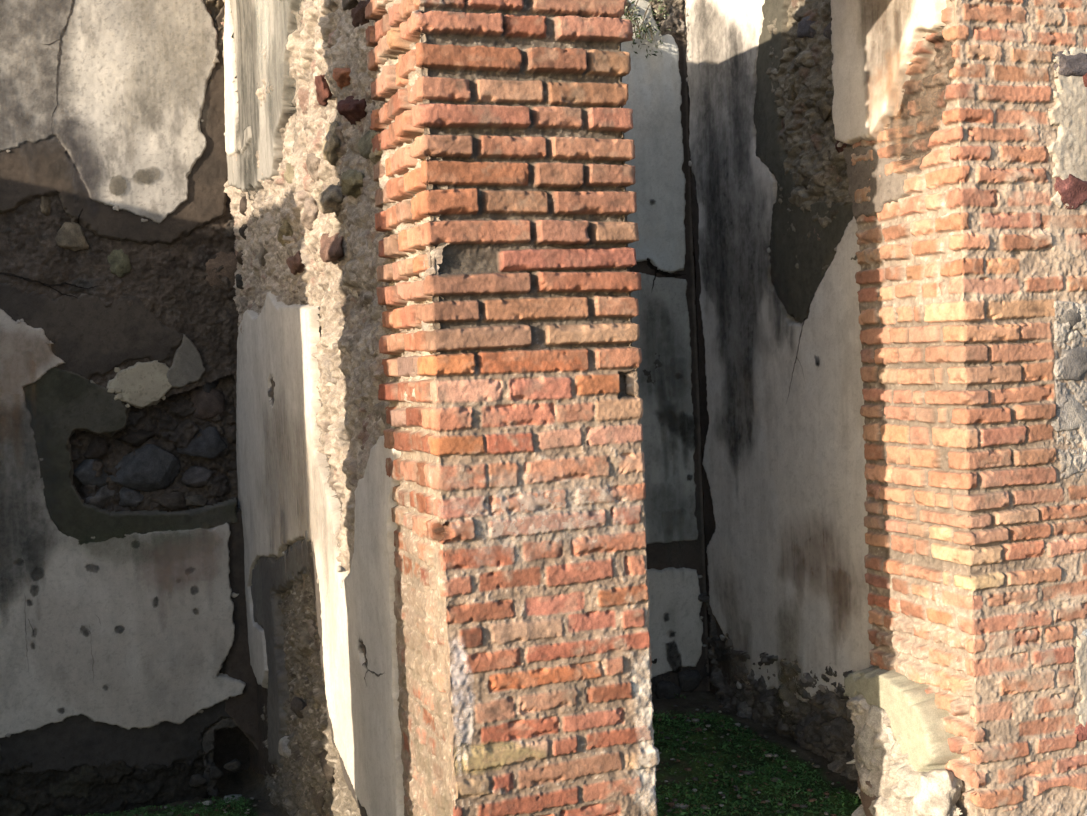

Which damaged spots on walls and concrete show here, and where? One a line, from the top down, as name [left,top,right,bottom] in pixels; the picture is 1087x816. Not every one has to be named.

crack [44,0,75,117]
flaking render [109,168,160,211]
spalling [235,196,248,289]
damp [690,0,772,462]
spalling [0,283,238,512]
spalling [190,718,243,797]